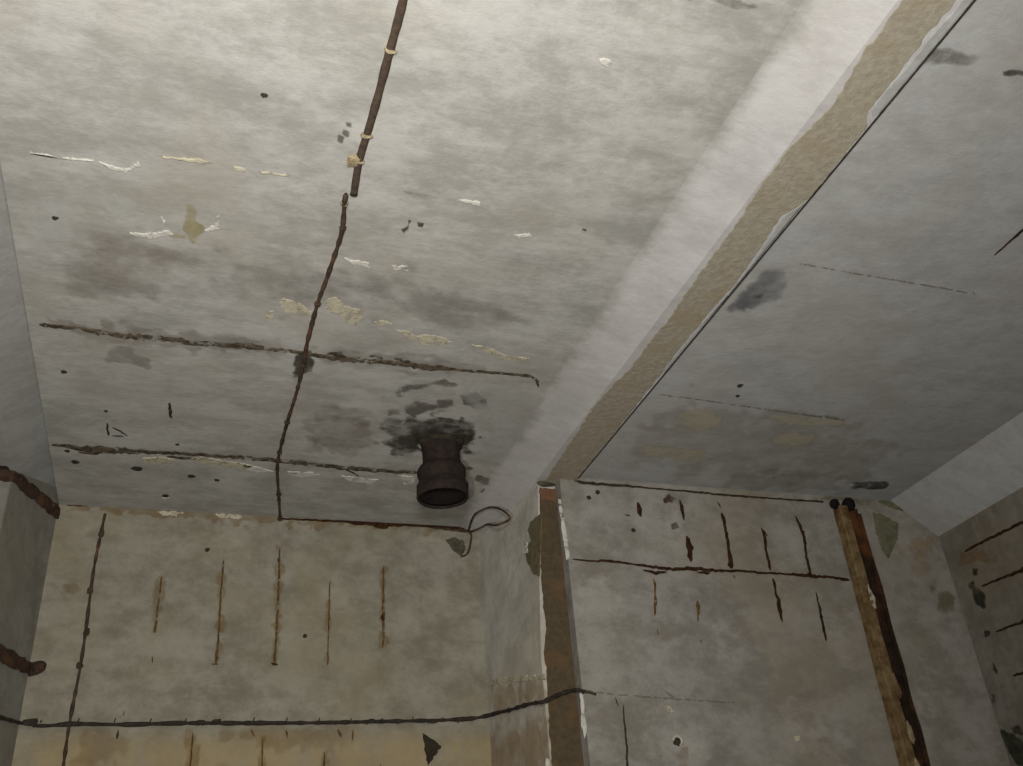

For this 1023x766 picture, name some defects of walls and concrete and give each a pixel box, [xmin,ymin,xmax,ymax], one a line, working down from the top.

peeling [871,0,973,117]
peeling [29,151,141,173]
peeling [129,216,174,239]
peeling [662,202,805,376]
peeling [325,297,451,346]
rust [663,495,685,529]
rust [686,536,694,562]
rust [717,502,736,578]
rust [761,528,783,622]
rust [795,516,811,576]
rust [271,547,280,665]
leakage [1000,726,1023,766]